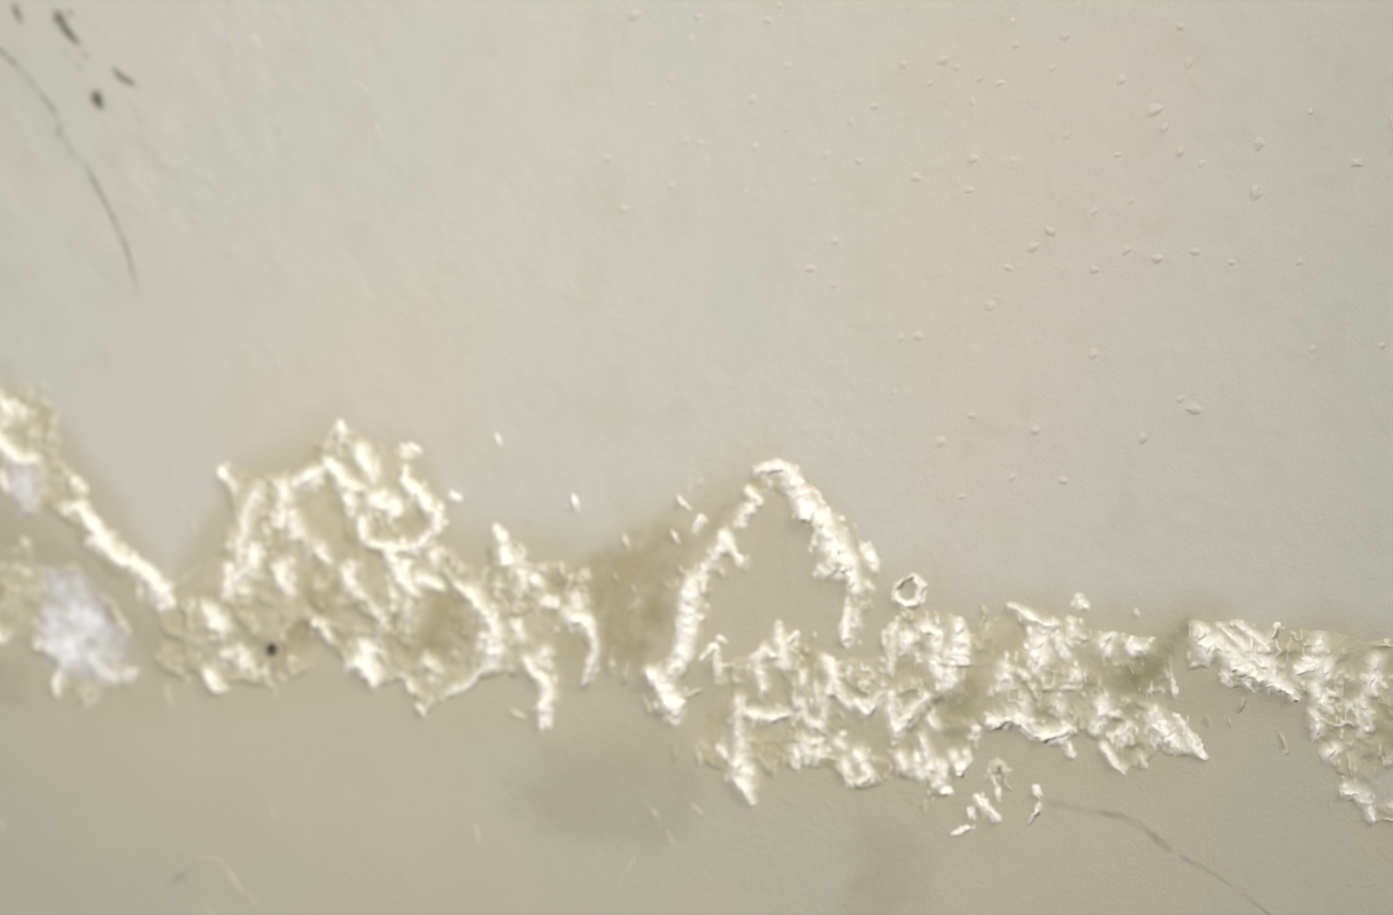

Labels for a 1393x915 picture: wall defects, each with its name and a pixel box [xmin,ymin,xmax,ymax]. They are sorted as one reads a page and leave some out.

flaking render [0,375,1393,835]